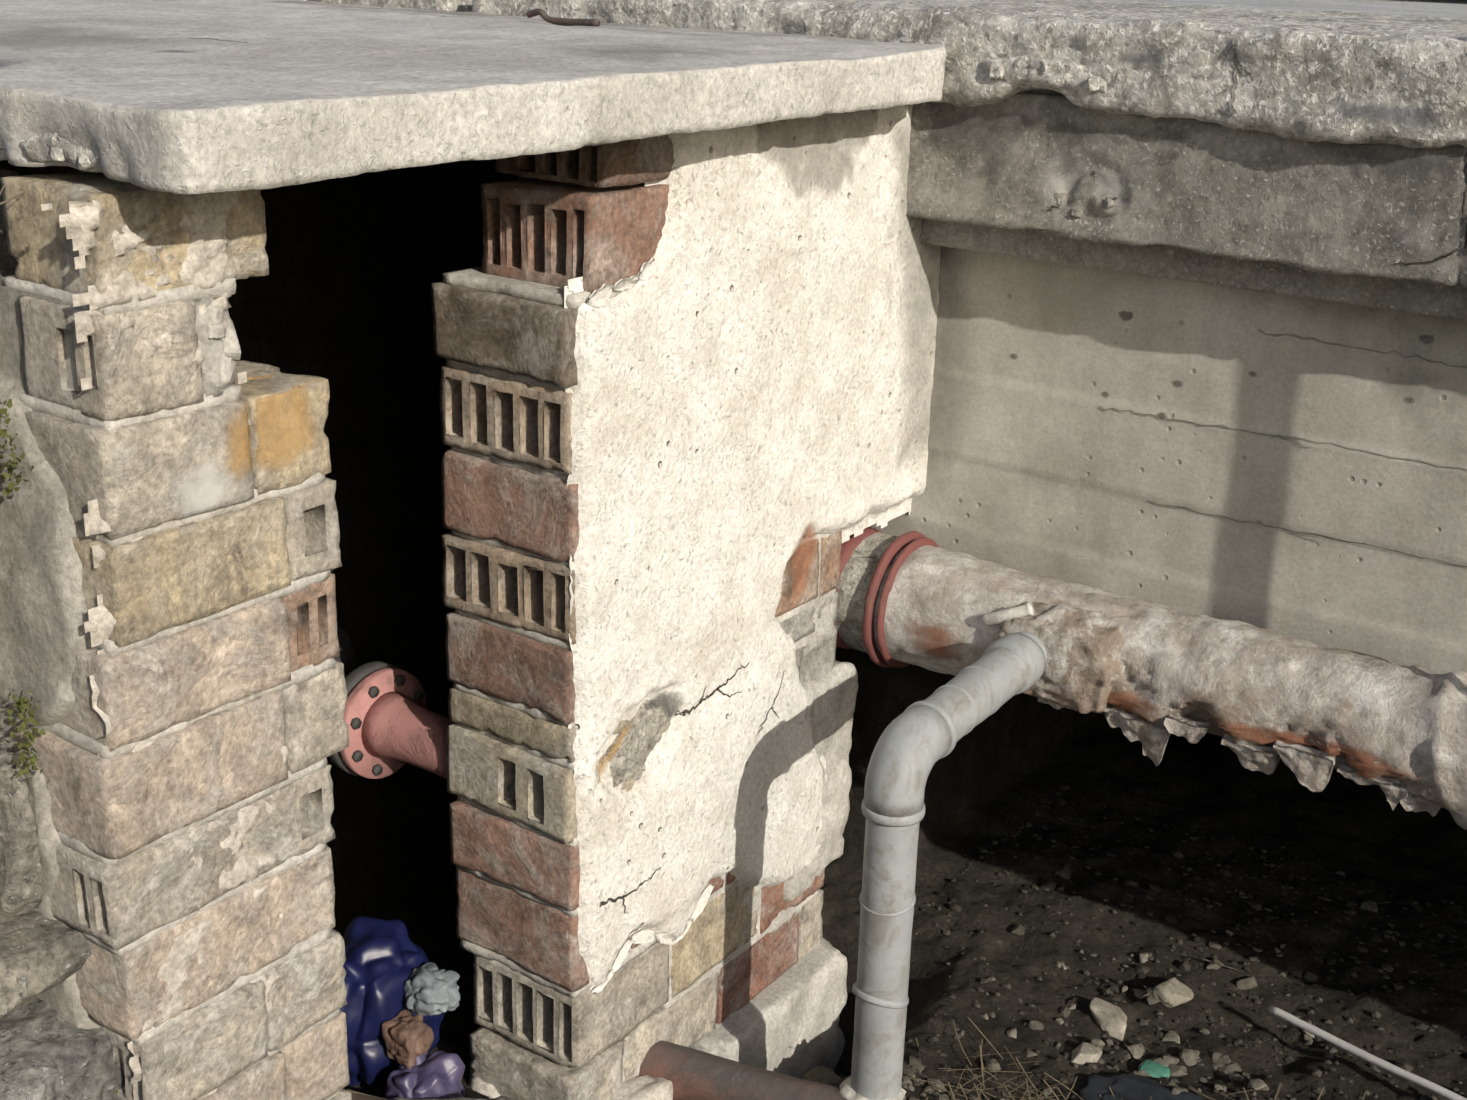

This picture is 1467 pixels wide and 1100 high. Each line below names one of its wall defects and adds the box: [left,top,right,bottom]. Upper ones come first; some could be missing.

crack [1393,153,1467,265]
peeling [584,257,658,308]
crack [675,663,785,735]
spalling [605,700,669,787]
crack [600,867,661,913]
peeling [590,883,714,994]